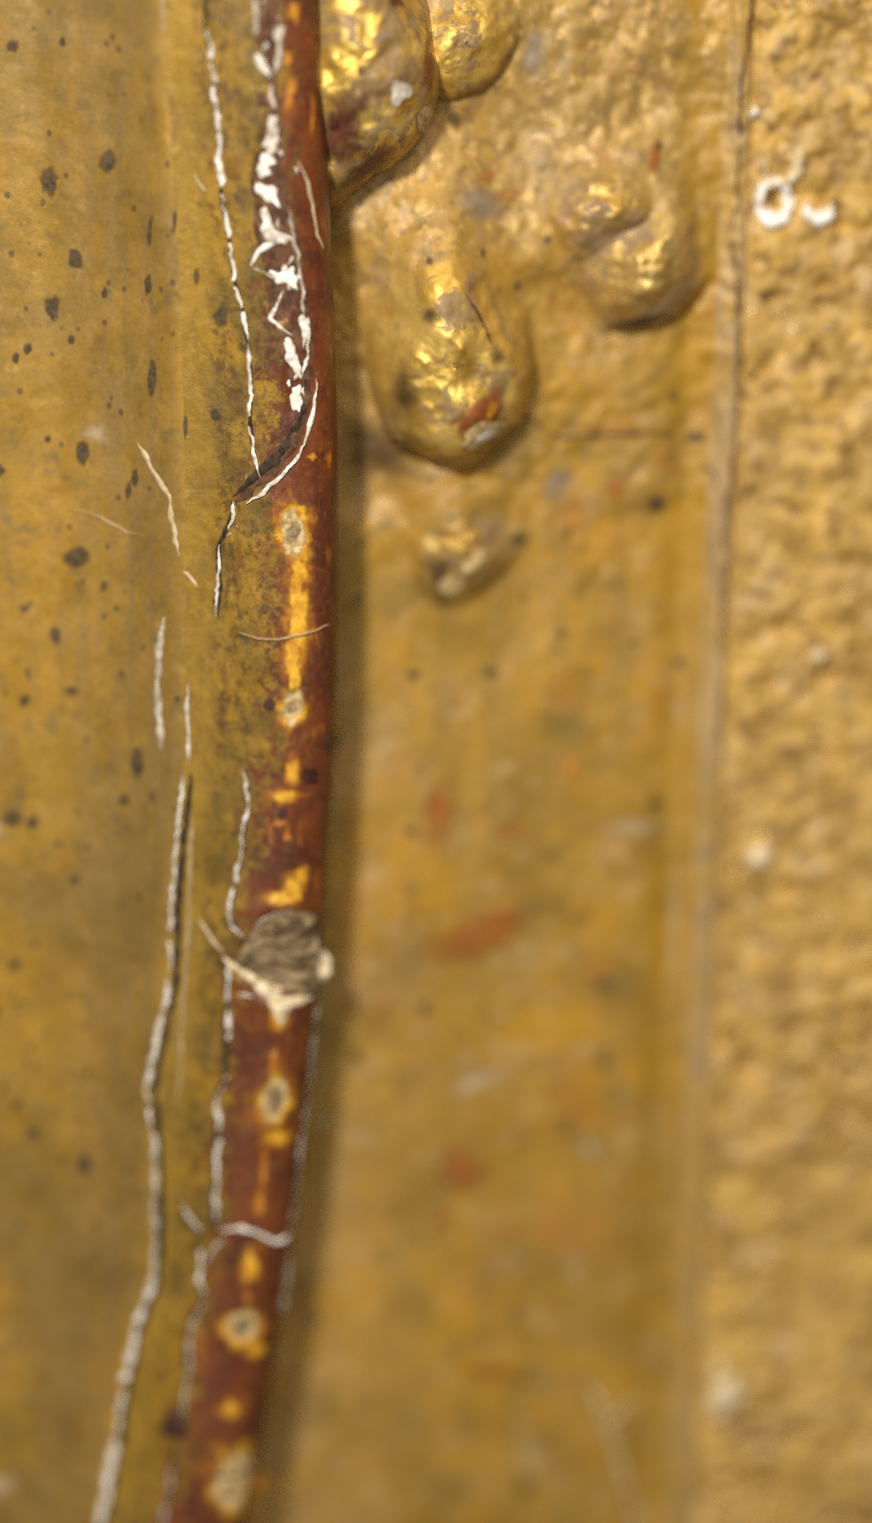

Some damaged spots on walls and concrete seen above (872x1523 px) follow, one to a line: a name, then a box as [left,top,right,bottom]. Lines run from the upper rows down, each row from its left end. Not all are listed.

crack [159,0,167,43]
crack [203,0,318,618]
damp [283,51,296,114]
crack [716,0,754,747]
crack [95,617,318,1523]